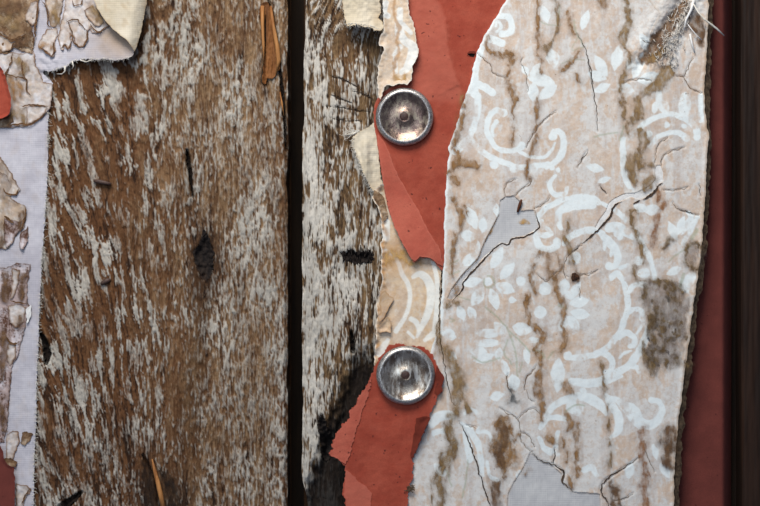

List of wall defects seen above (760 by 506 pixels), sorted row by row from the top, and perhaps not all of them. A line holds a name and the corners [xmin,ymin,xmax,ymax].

peeling [0,0,109,128]
crack [581,40,598,127]
peeling [0,157,29,249]
peeling [448,196,540,300]
damp [629,209,645,264]
peeling [0,263,33,467]
crack [436,281,455,405]
damp [632,267,690,375]
crack [462,425,490,504]
crack [501,368,573,492]
peeling [507,453,601,506]
crack [600,451,654,506]